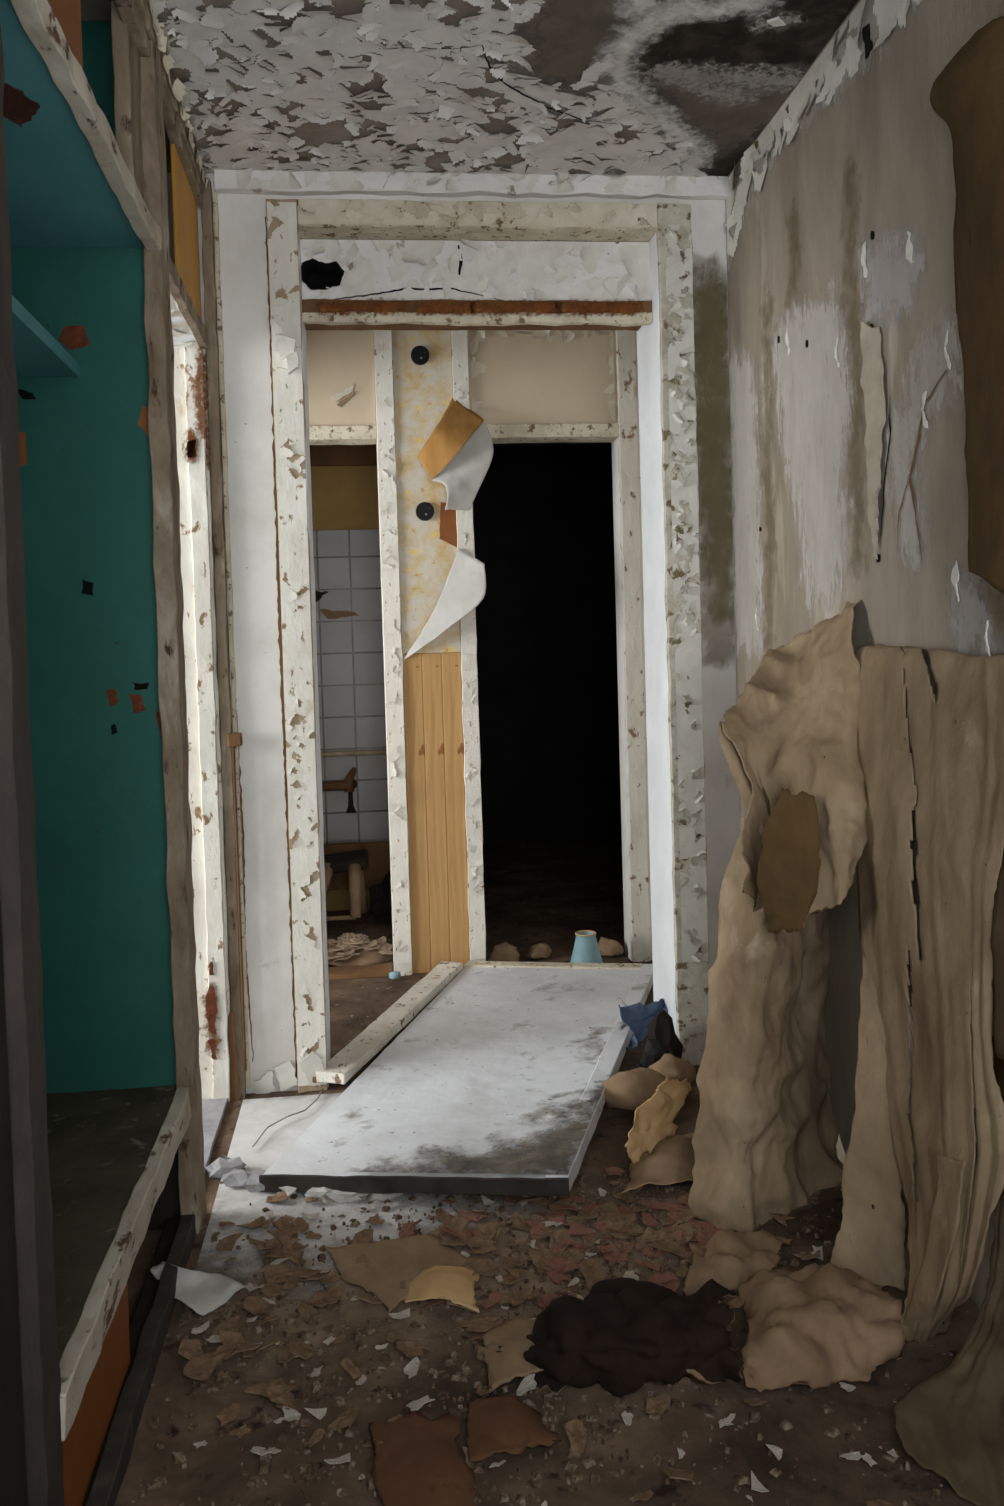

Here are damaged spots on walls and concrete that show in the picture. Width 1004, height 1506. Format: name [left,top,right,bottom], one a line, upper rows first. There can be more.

peeling [725,0,922,285]
peeling [857,230,925,326]
peeling [141,0,709,1094]
peeling [729,349,764,658]
peeling [773,280,853,612]
peeling [884,318,964,571]
peeling [951,561,996,656]
corrosion [202,961,222,1060]